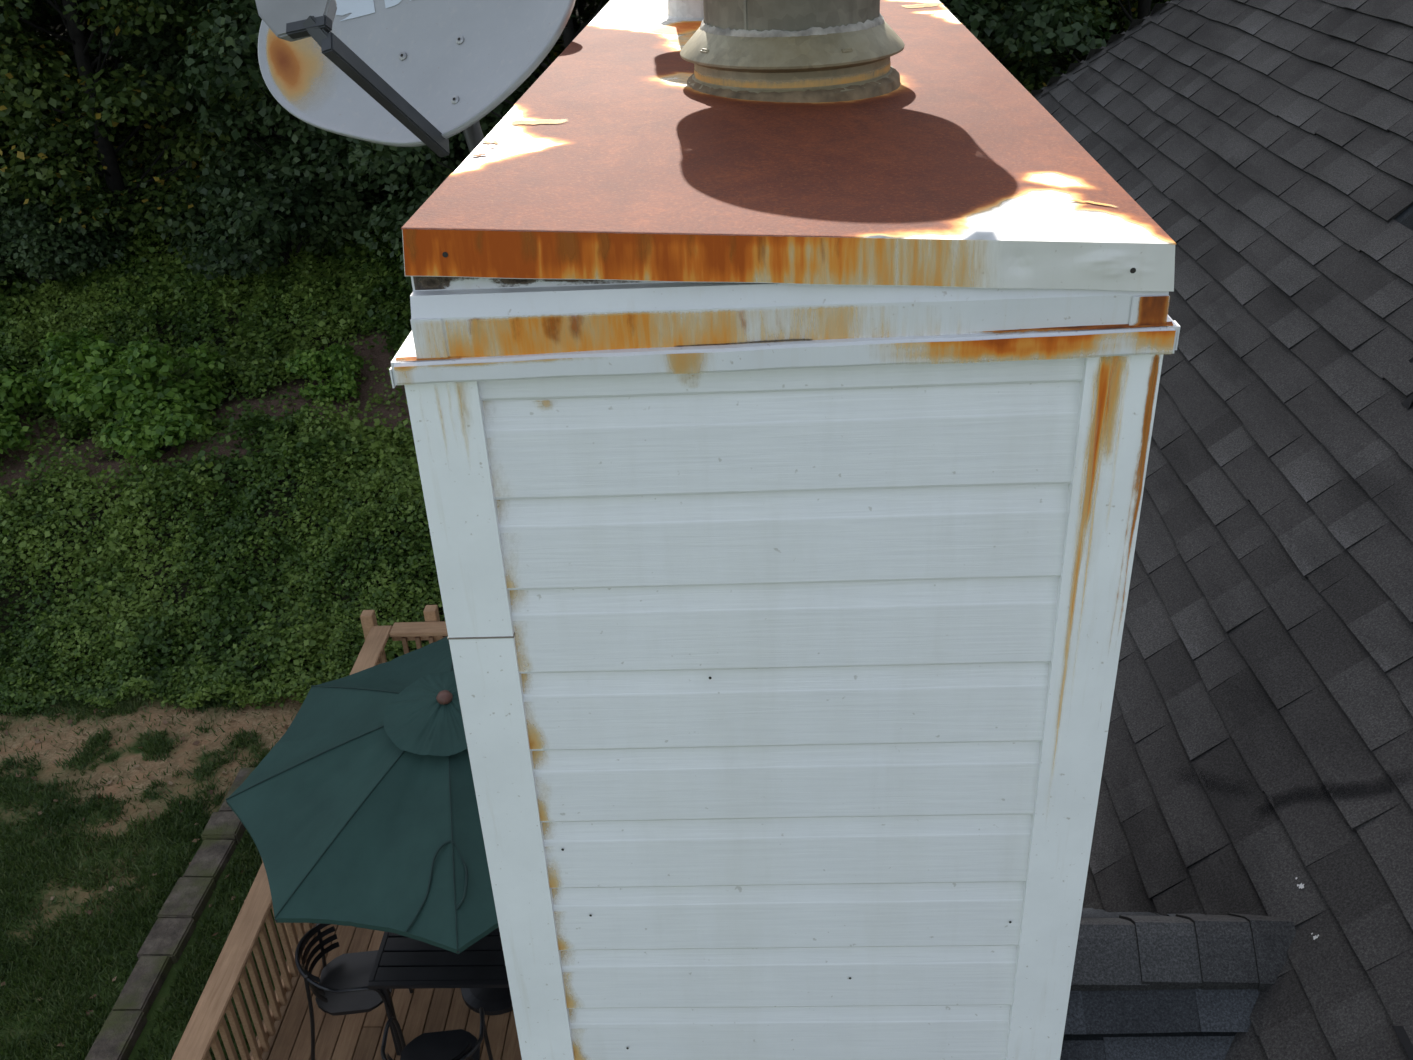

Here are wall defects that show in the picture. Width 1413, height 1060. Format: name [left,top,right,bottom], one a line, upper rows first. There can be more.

corrosion [401,0,1176,287]
corrosion [394,307,853,374]
corrosion [895,296,1176,749]